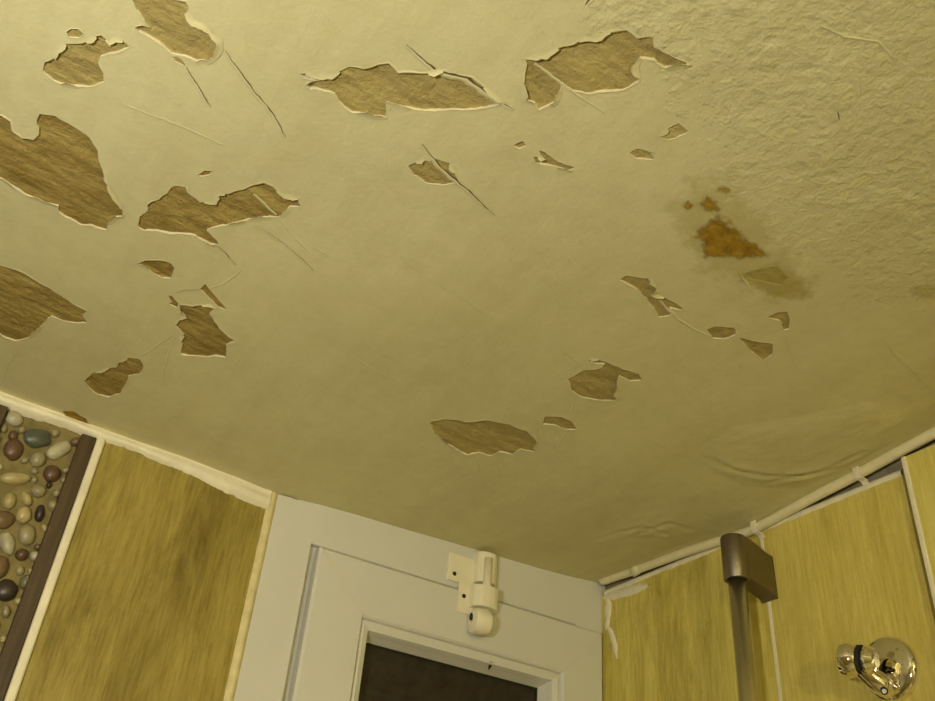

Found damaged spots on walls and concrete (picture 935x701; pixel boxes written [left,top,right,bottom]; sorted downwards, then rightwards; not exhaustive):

peeling [42,28,133,89]
peeling [131,0,285,138]
peeling [298,45,514,120]
peeling [520,29,694,113]
peeling [0,113,125,231]
corrosion [684,198,765,259]
peeling [0,181,314,398]
peeling [619,274,774,361]
peeling [740,265,790,294]
peeling [766,311,797,370]
peeling [428,349,643,477]